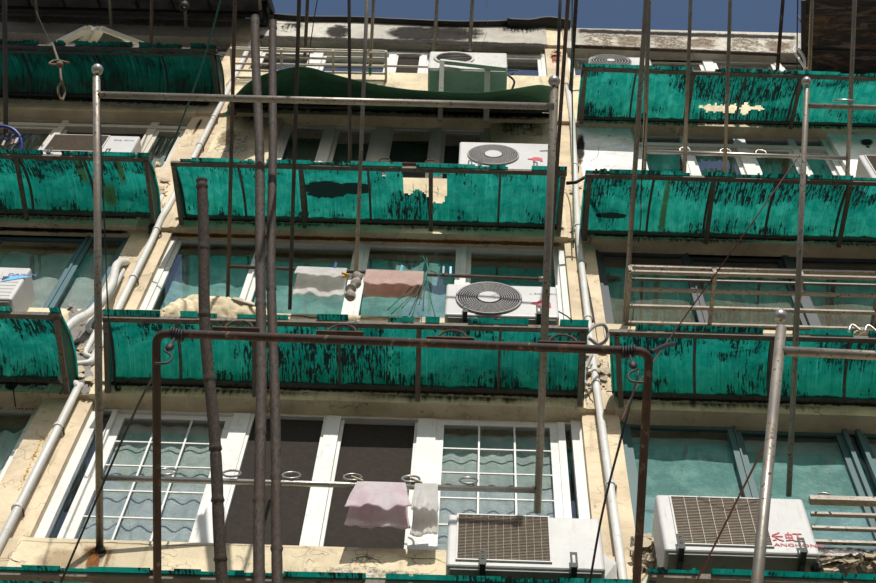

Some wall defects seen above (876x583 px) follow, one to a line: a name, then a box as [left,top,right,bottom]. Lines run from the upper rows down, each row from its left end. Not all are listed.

water stain [260,23,543,48]
corrosion [85,546,111,569]